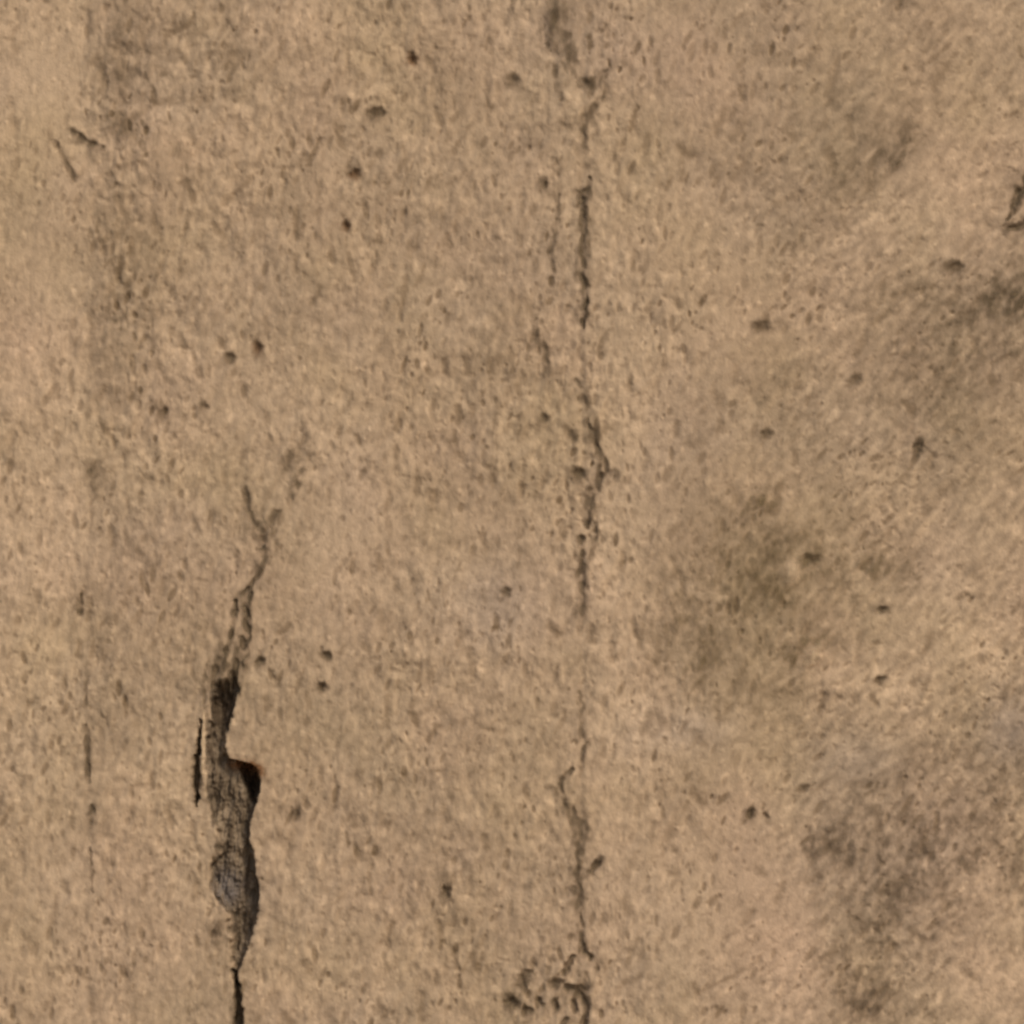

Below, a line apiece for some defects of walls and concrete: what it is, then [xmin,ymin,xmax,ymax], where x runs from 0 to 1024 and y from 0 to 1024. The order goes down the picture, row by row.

crack [577,176,591,329]
crack [576,424,607,615]
crack [211,545,266,695]
crack [192,739,202,806]
crack [558,768,599,971]
crack [232,969,244,1024]